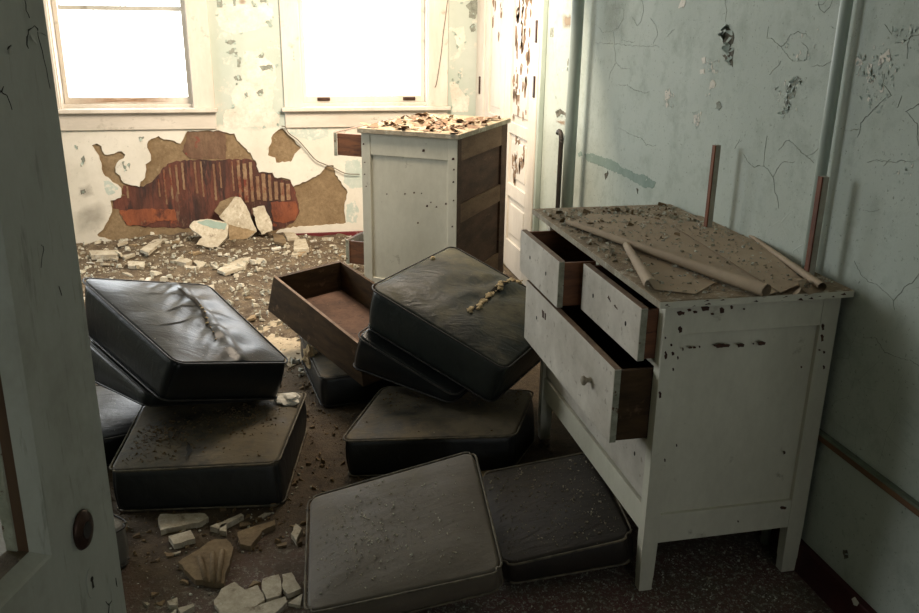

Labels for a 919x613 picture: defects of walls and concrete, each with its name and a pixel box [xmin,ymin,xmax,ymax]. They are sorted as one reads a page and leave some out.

peeling [512,0,532,122]
peeling [718,24,734,67]
flaking render [92,0,348,240]
peeling [361,68,501,133]
peeling [778,76,801,118]
crack [845,74,919,140]
peeling [512,135,525,186]
crack [735,138,818,208]